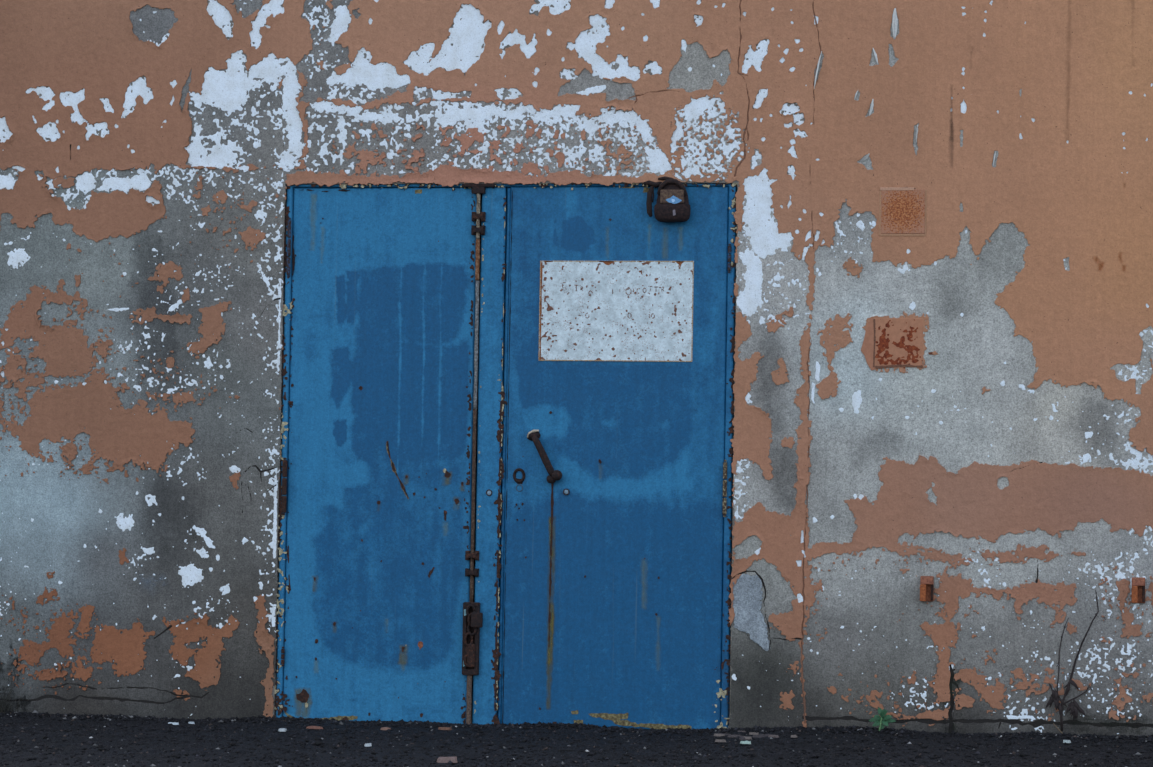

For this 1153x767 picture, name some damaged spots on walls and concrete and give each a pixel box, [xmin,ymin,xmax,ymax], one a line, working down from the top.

peeling [742,39,804,74]
crack [812,2,821,121]
peeling [753,89,812,180]
peeling [0,0,763,720]
rust [875,319,933,370]
rust [413,371,472,549]
peeling [714,168,1153,742]
rust [547,483,570,680]
crack [732,340,1153,734]
crack [0,683,209,714]
peeling [571,710,692,729]